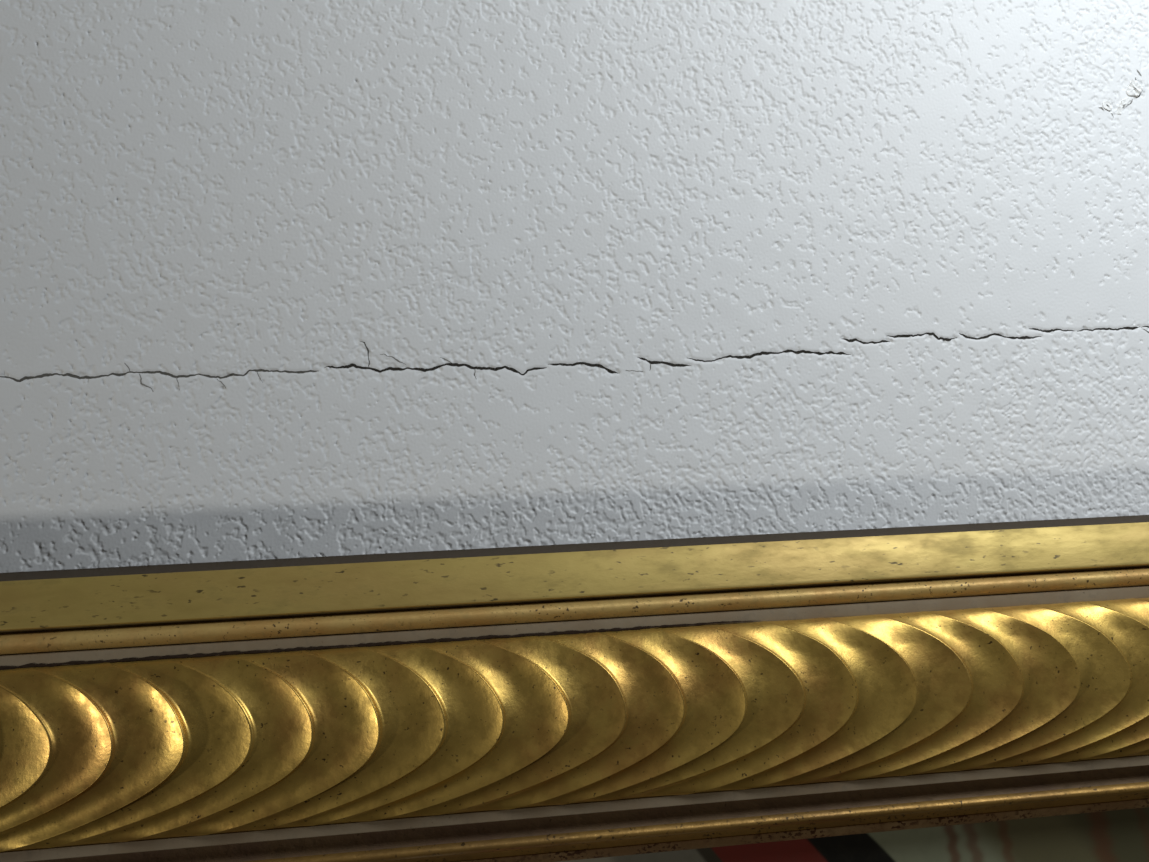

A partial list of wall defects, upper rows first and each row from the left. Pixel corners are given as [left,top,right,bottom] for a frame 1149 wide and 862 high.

peeling [1099,70,1143,117]
crack [0,326,1149,391]